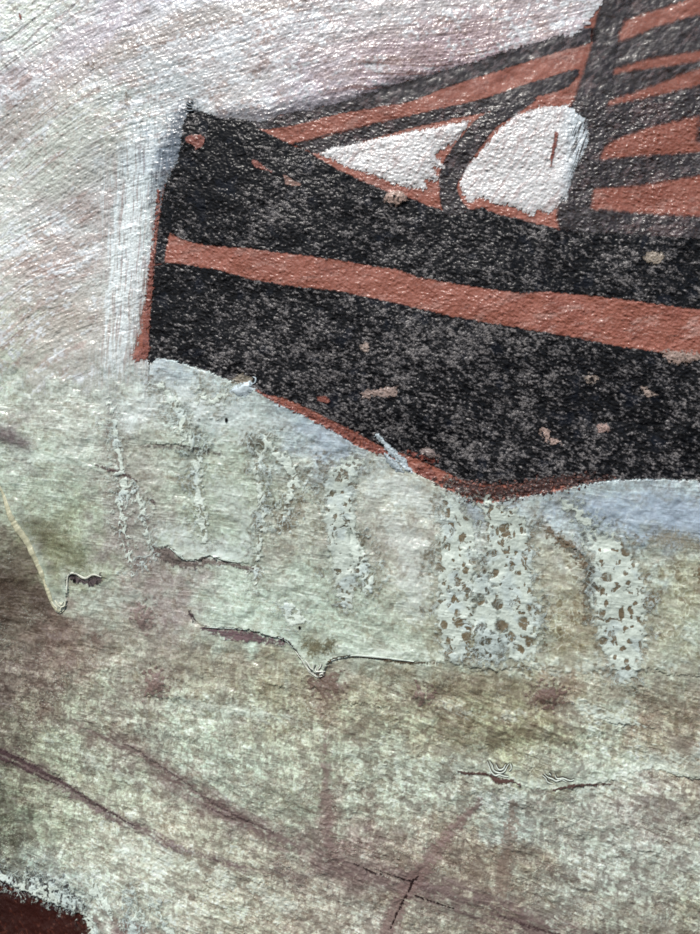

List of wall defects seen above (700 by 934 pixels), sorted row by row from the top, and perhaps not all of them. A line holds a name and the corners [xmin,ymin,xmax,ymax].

peeling [105,372,662,692]
crack [458,771,521,787]
crack [552,783,611,791]
peeling [0,858,175,934]
crack [354,863,454,929]